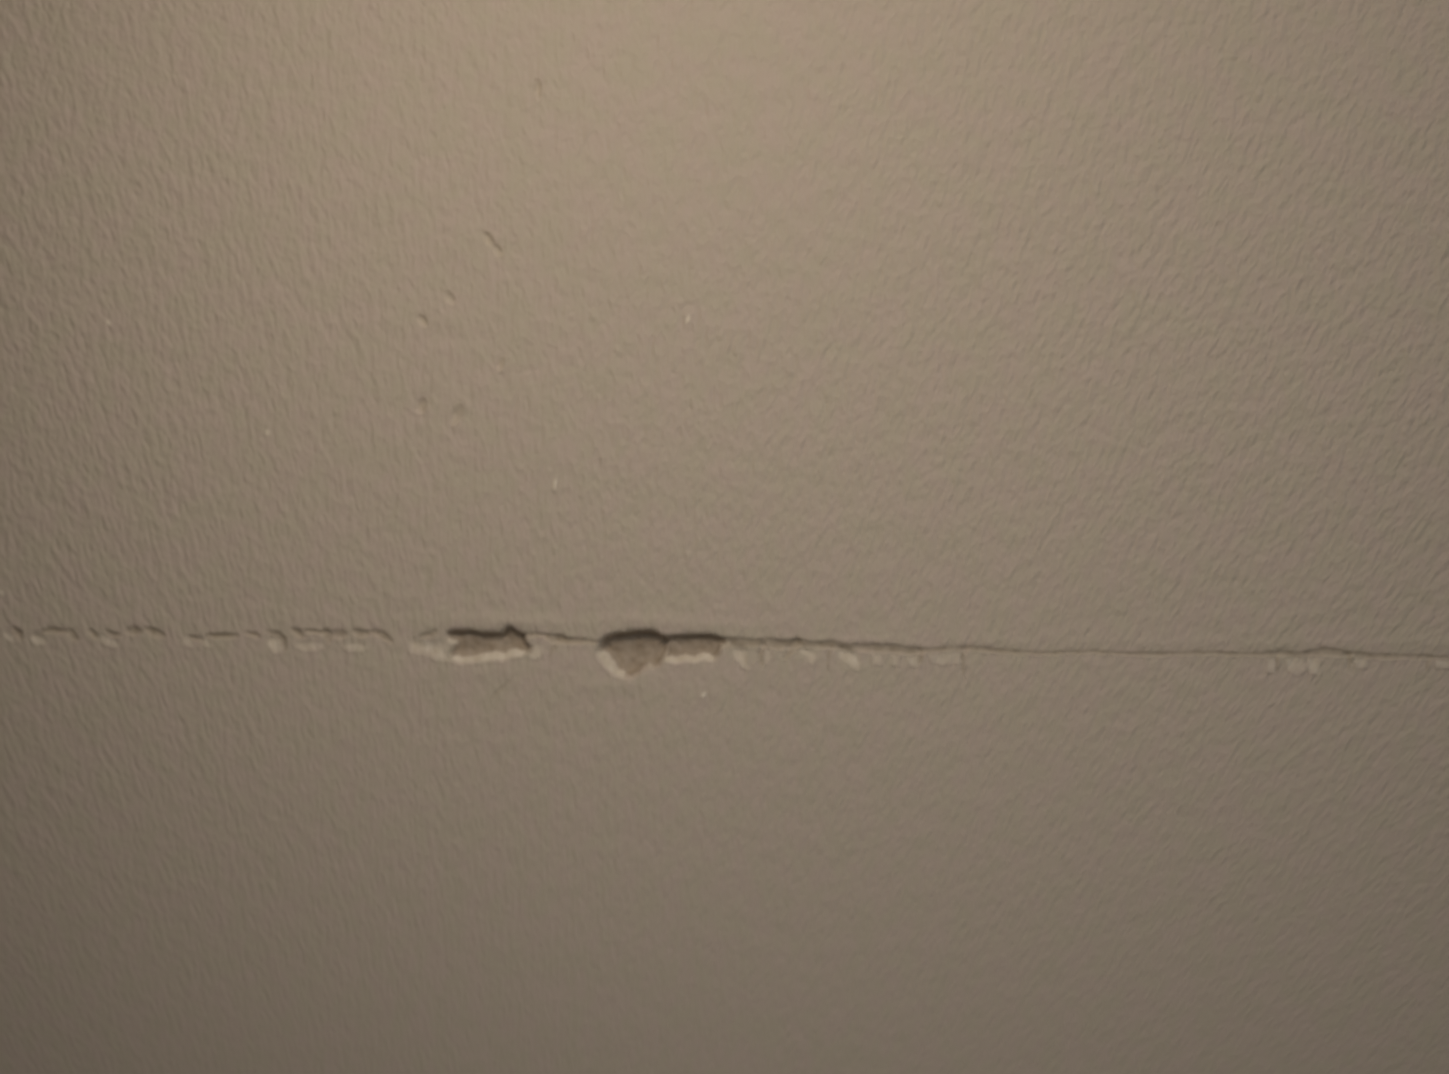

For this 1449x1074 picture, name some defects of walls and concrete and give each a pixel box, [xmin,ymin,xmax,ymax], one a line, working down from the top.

crack [10,624,395,652]
flaking render [405,624,533,667]
crack [527,631,600,656]
flaking render [593,629,751,681]
crack [724,635,1449,678]